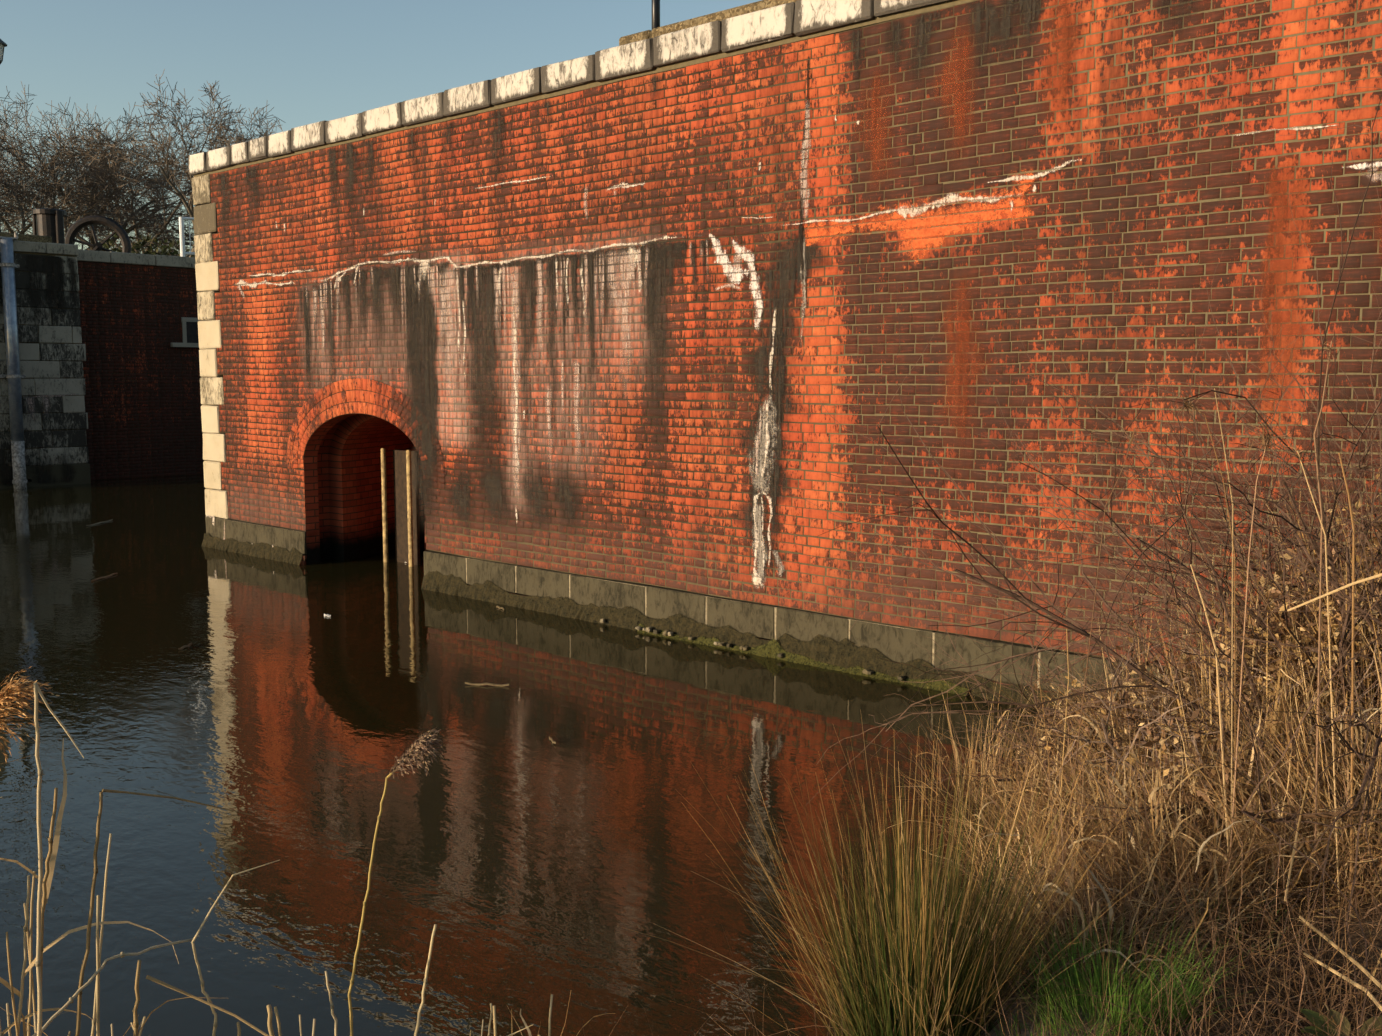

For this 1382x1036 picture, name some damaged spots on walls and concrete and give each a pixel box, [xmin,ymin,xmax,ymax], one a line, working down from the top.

water stain [26,255,78,312]
water stain [300,234,826,568]
water stain [0,455,13,485]